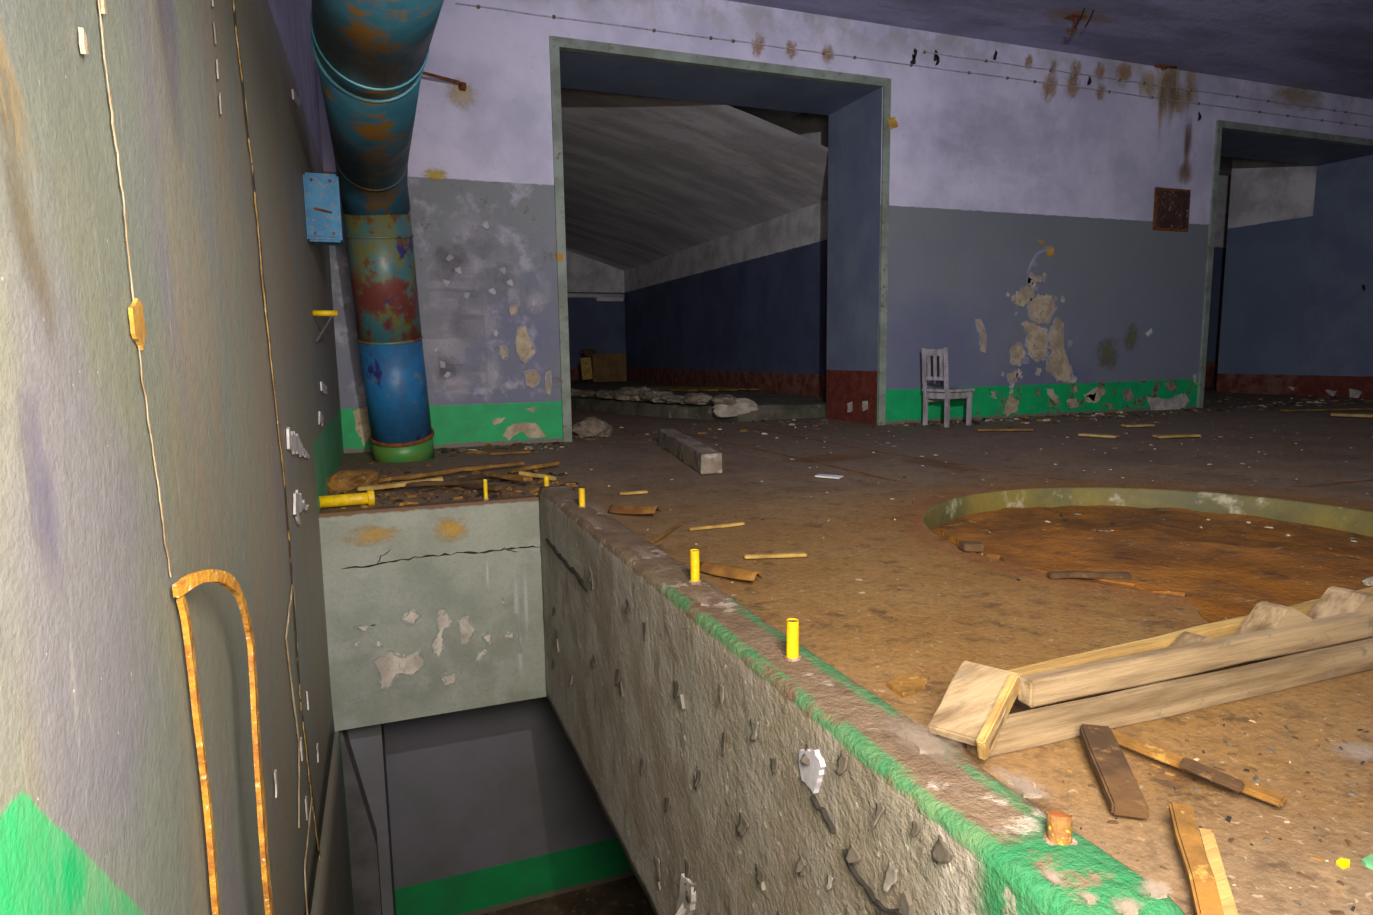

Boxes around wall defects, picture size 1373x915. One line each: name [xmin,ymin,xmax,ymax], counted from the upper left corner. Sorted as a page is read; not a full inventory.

rust [1044,62,1079,97]
rust [1096,63,1195,123]
rust [427,170,445,180]
rust [1180,128,1191,178]
peeling [426,221,553,396]
peeling [989,239,1197,418]
peeling [492,407,547,441]
crack [343,538,588,592]
peeling [352,608,515,690]
peeling [799,743,848,794]
peeling [932,834,953,864]
spalling [676,860,710,915]